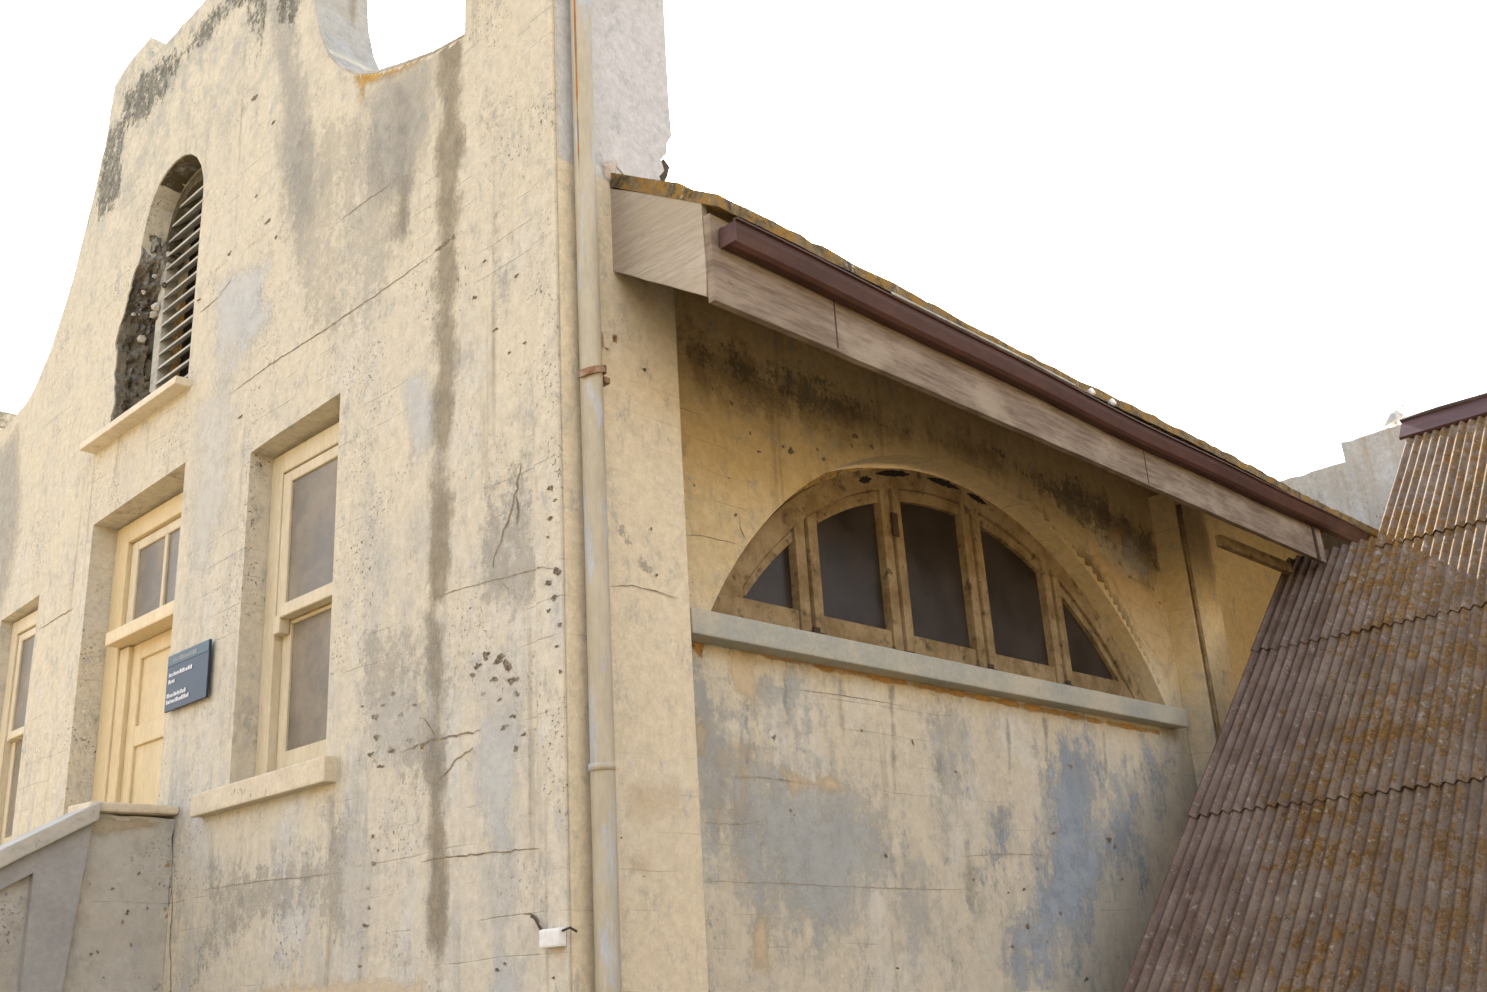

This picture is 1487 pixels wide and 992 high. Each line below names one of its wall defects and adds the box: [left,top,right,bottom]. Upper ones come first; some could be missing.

leakage [96,0,301,221]
leakage [370,40,464,450]
leakage [427,468,453,695]
crack [437,464,564,598]
leakage [423,727,447,951]
crack [399,718,481,782]